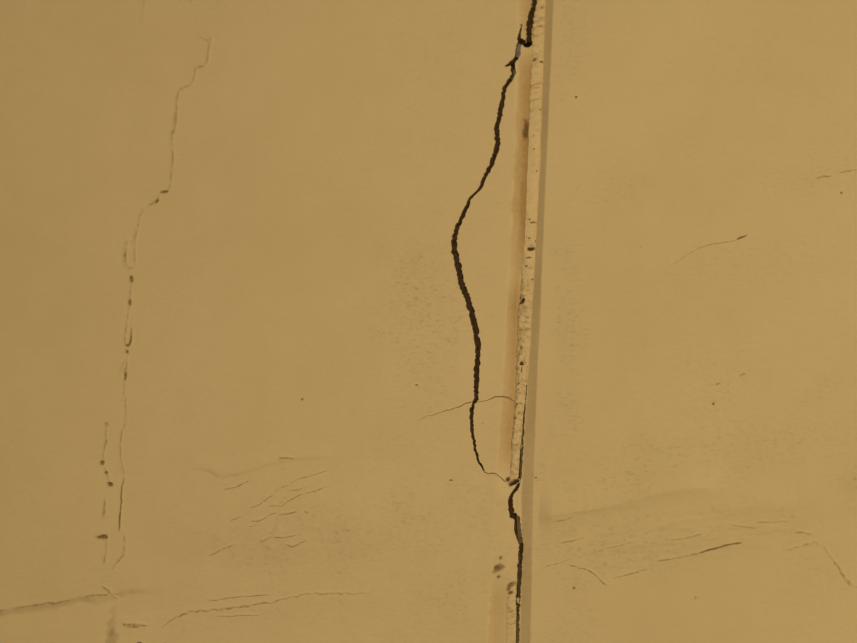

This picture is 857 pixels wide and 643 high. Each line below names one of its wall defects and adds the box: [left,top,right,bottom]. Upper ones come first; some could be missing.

crack [111,33,214,570]
crack [416,0,537,643]